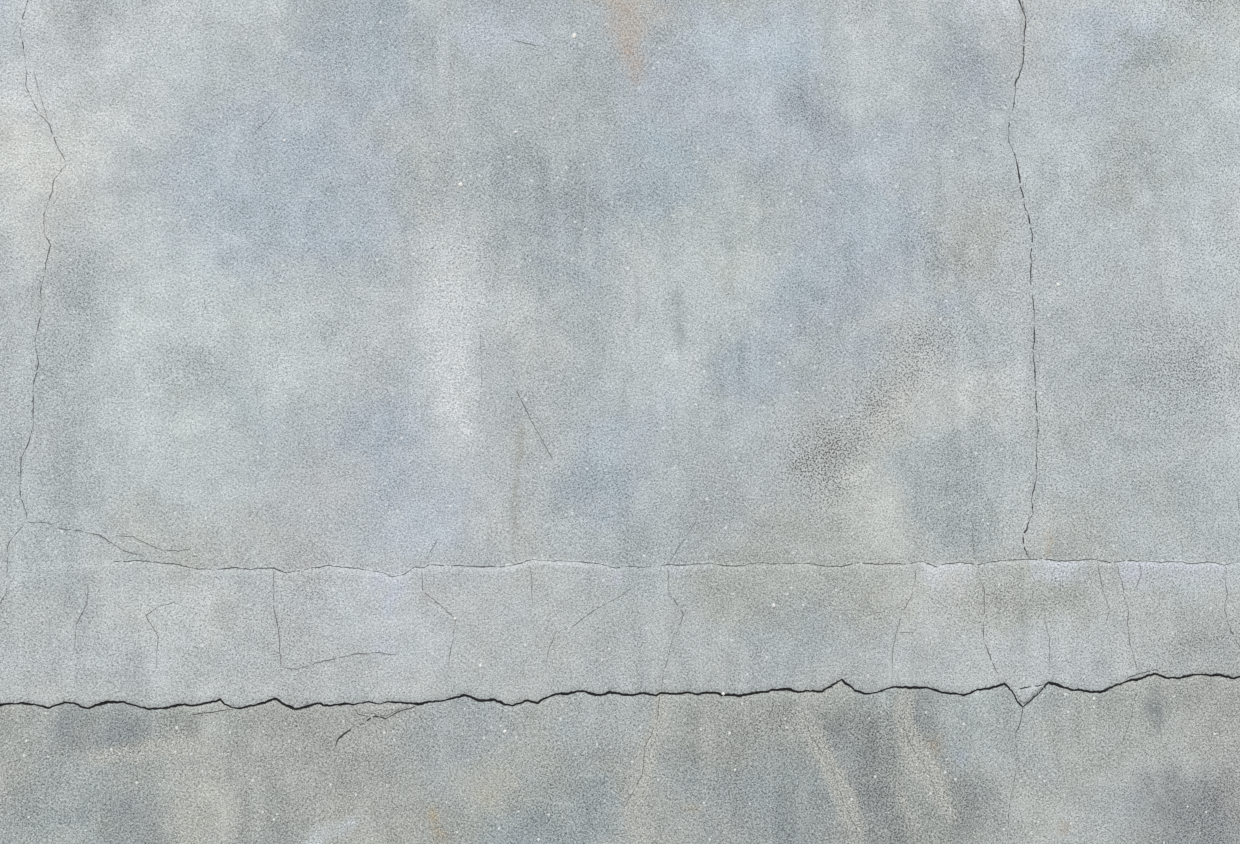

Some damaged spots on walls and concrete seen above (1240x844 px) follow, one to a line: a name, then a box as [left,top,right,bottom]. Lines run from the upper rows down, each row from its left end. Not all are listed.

crack [20,0,71,478]
crack [0,123,1240,749]
crack [1012,0,1026,110]